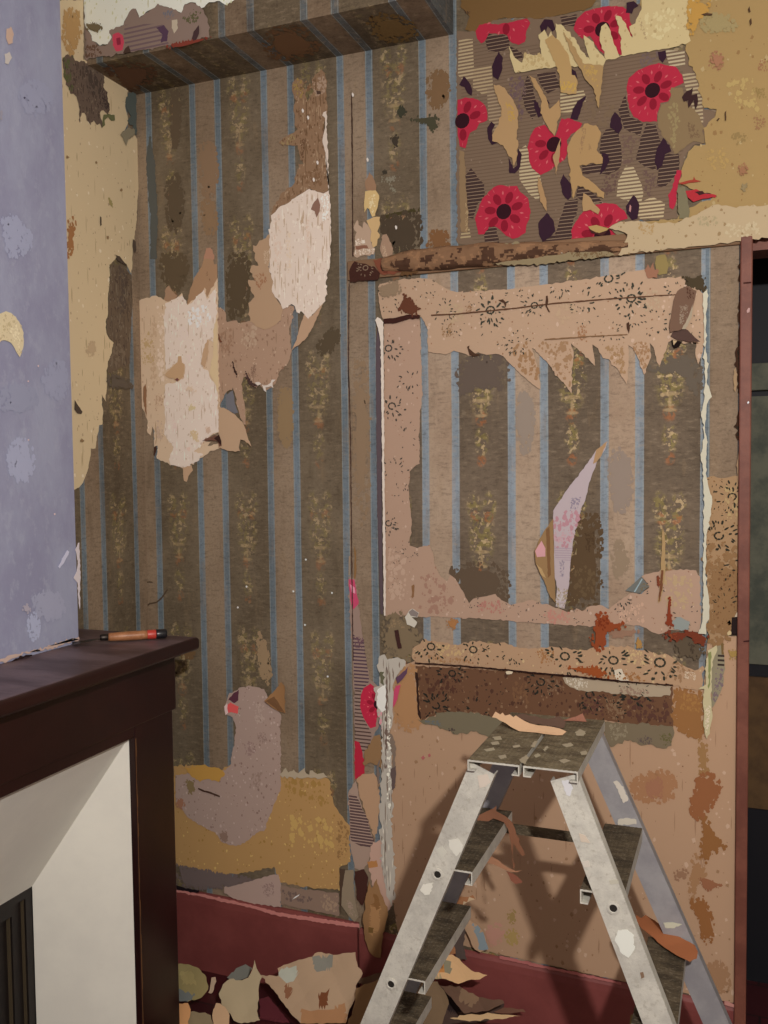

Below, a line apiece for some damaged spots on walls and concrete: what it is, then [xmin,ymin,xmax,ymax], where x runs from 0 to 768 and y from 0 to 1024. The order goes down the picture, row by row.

flaking render [60,0,234,490]
flaking render [268,178,331,319]
flaking render [405,609,419,627]
corrosion [589,611,640,652]
corrosion [662,597,710,646]
damp [629,768,678,805]
flaking render [174,765,351,899]